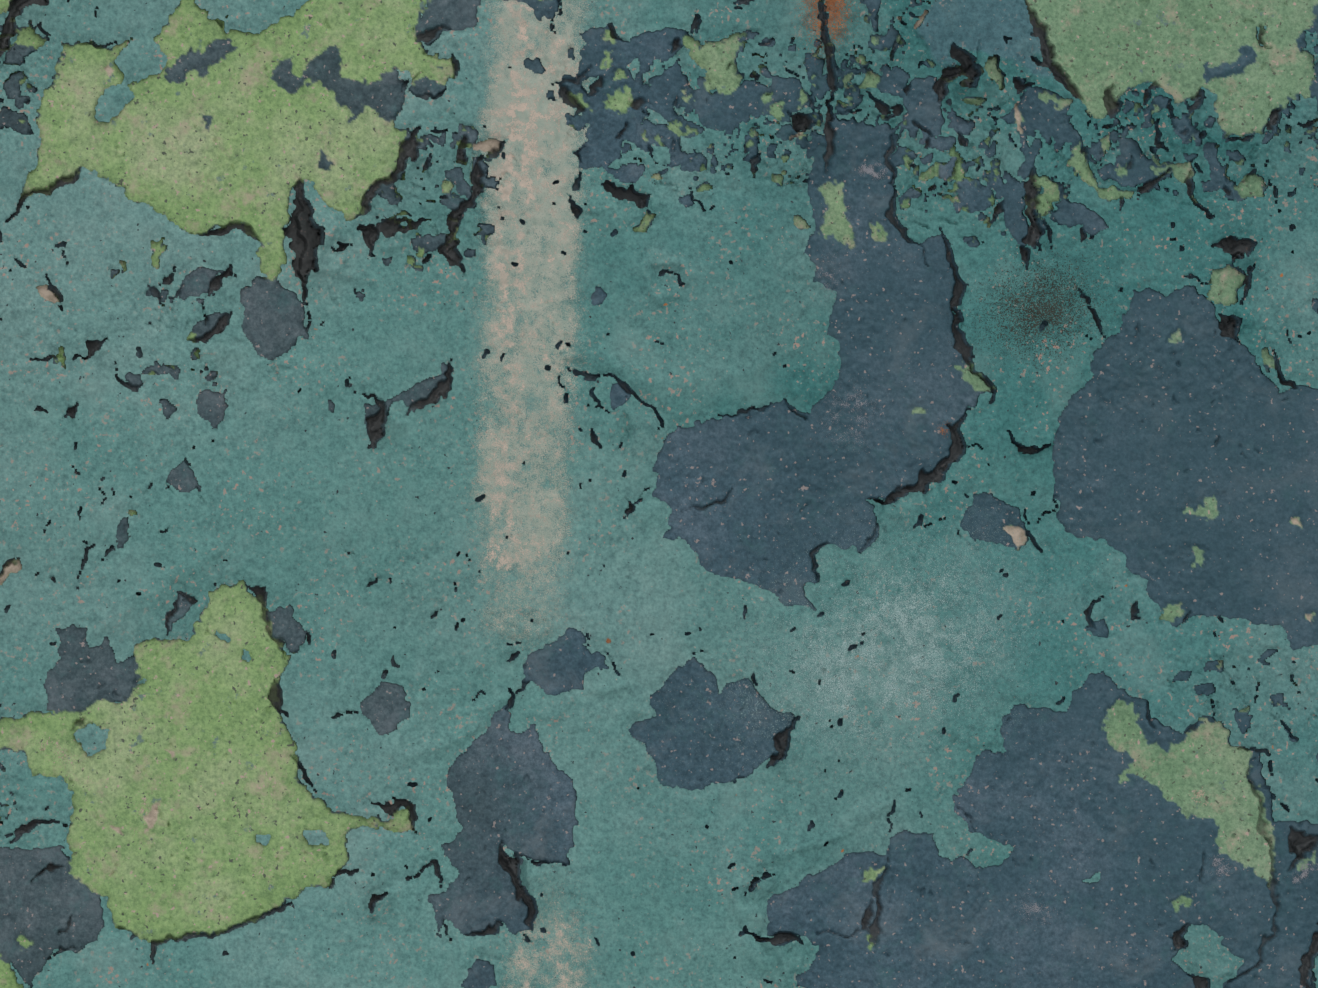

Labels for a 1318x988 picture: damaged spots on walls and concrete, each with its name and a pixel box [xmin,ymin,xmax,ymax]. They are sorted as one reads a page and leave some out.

crack [0,44,69,311]
peeling [0,0,517,371]
peeling [504,0,557,34]
corrosion [787,0,871,66]
crack [817,0,851,179]
crack [34,403,89,432]
crack [29,338,143,392]
peeling [551,0,1318,694]
peeling [0,575,428,988]
peeling [372,627,620,988]
peeling [628,649,814,791]
peeling [739,671,1318,988]